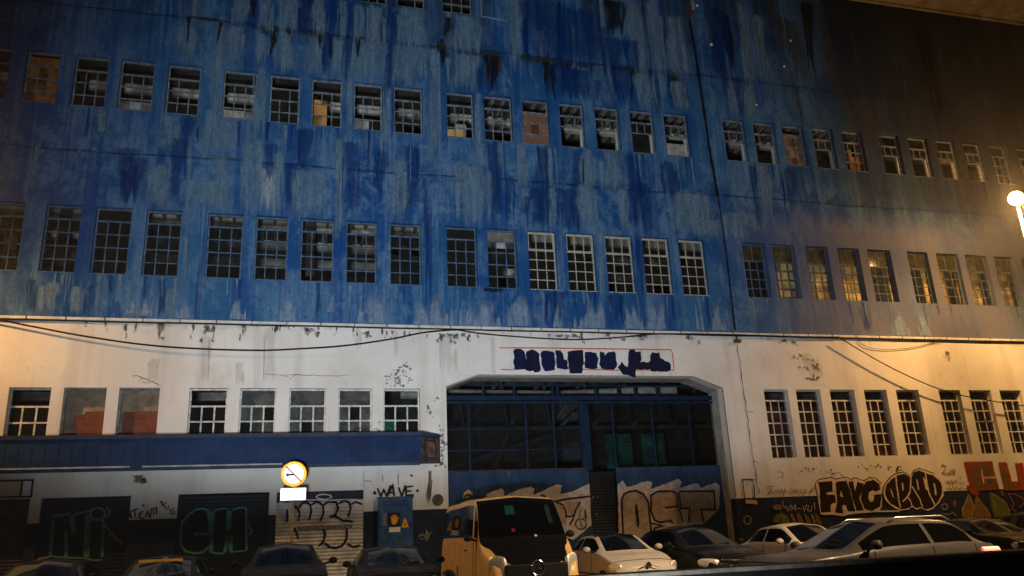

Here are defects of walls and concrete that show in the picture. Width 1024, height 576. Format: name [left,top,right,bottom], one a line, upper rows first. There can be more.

damp [161,0,687,225]
peeling [385,362,413,387]
crack [723,278,784,491]